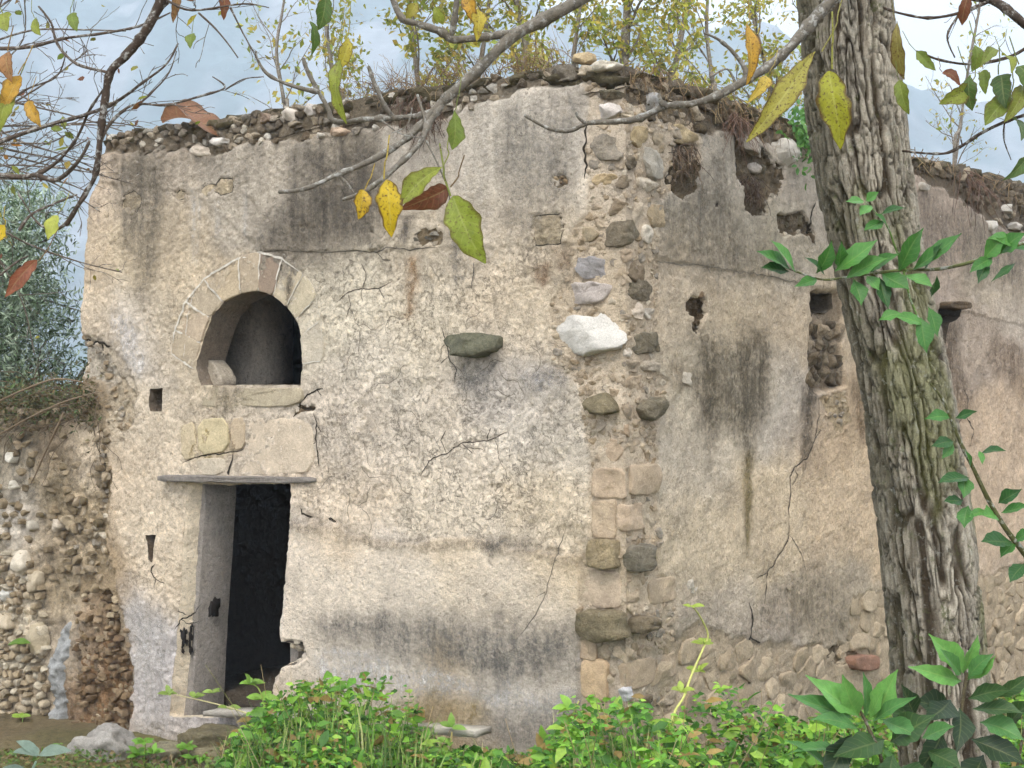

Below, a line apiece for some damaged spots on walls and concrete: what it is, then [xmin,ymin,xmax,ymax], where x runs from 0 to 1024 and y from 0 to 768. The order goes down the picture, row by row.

water stain [261,143,384,245]
crack [581,126,589,179]
flaking render [735,140,815,243]
crack [264,247,507,532]
crack [436,312,566,403]
flaking render [685,291,709,333]
water stain [697,331,770,458]
flaking render [67,335,137,730]
crack [517,526,566,639]
crack [748,389,821,684]
water stain [320,612,568,746]